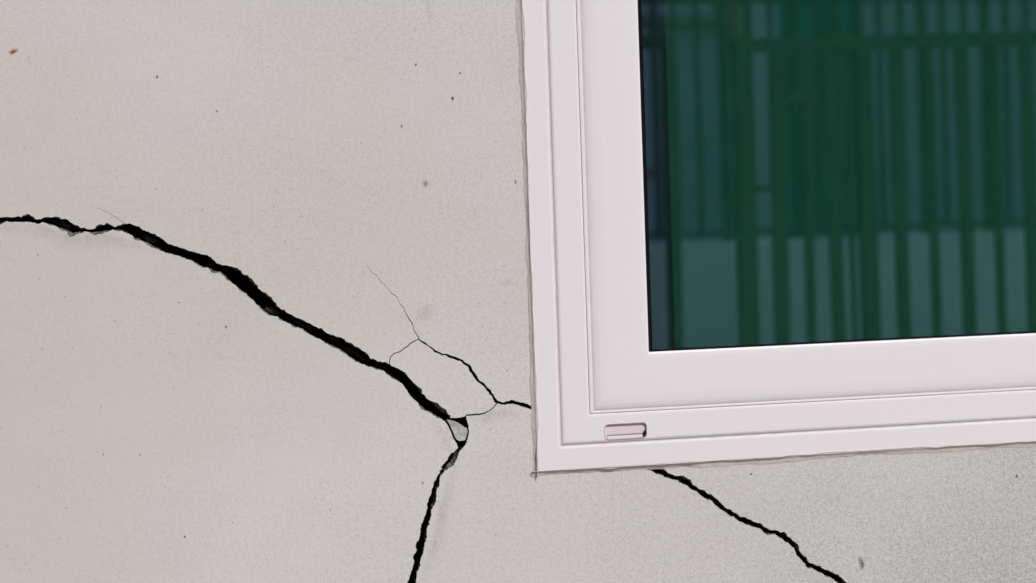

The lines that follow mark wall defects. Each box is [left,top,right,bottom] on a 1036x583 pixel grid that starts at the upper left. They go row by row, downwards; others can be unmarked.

crack [0,210,531,583]
crack [647,469,846,583]